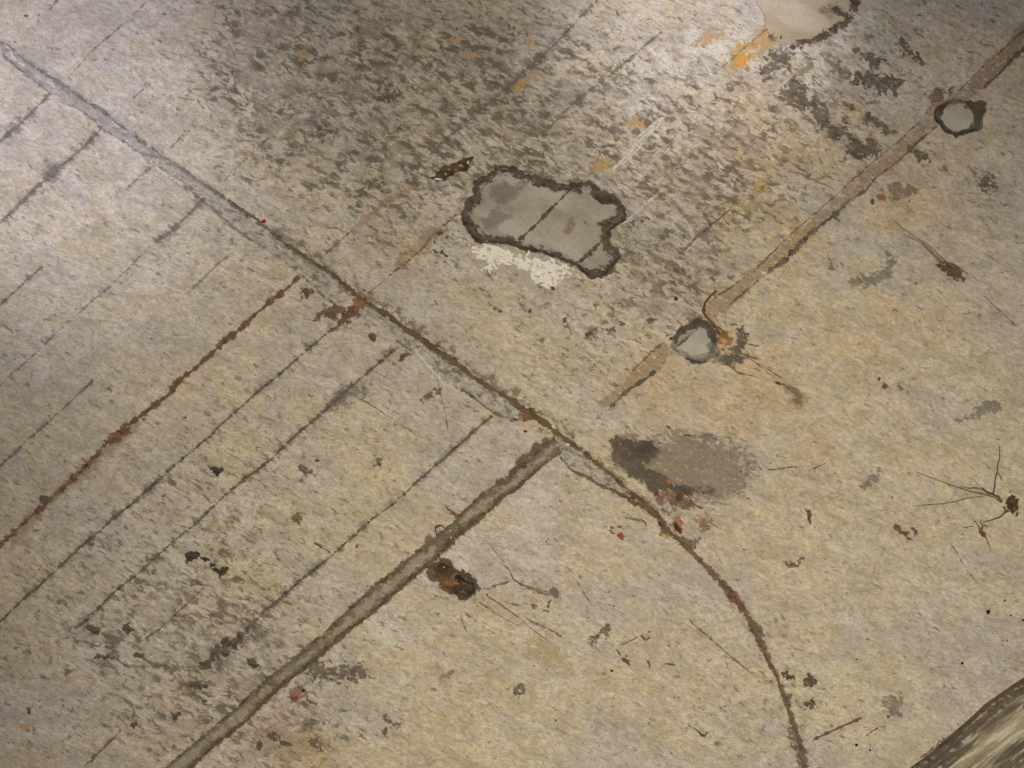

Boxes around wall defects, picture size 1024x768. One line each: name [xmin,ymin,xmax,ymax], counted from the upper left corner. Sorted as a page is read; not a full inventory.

flaking render [757,0,861,50]
spalling [431,156,628,280]
leakage [471,241,588,300]
corrosion [0,275,301,548]
crack [0,42,862,768]
leakage [609,435,715,496]